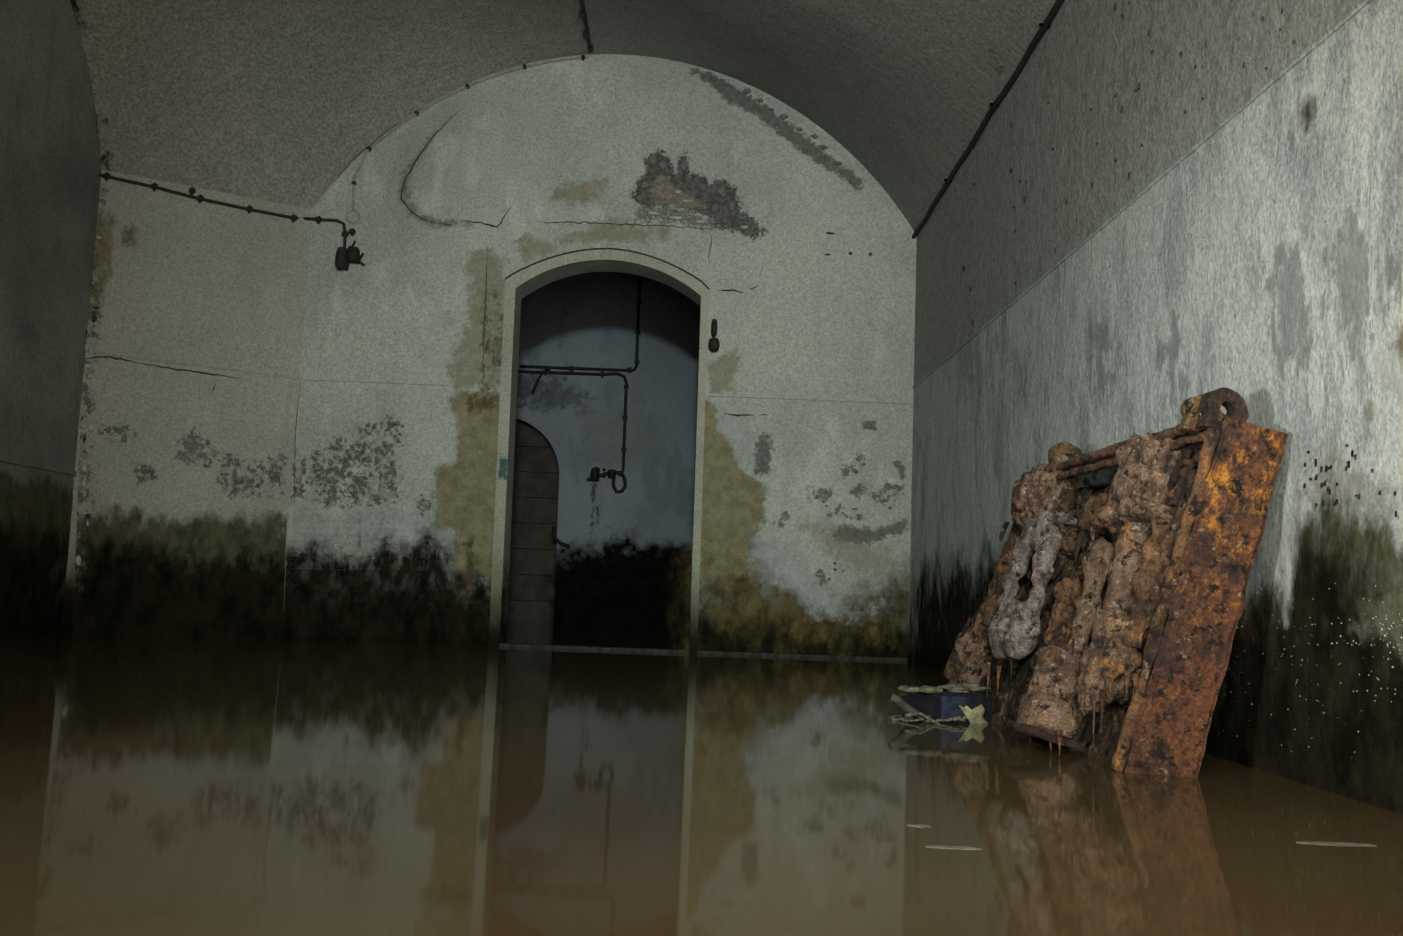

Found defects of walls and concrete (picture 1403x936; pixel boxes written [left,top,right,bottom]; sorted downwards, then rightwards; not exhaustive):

flaking render [629,148,768,242]
water stain [1378,328,1403,384]
water stain [307,250,504,575]
peeling [176,416,404,509]
water stain [700,356,837,617]
peeling [808,421,908,543]
water stain [1281,503,1295,600]
water stain [1363,568,1403,659]